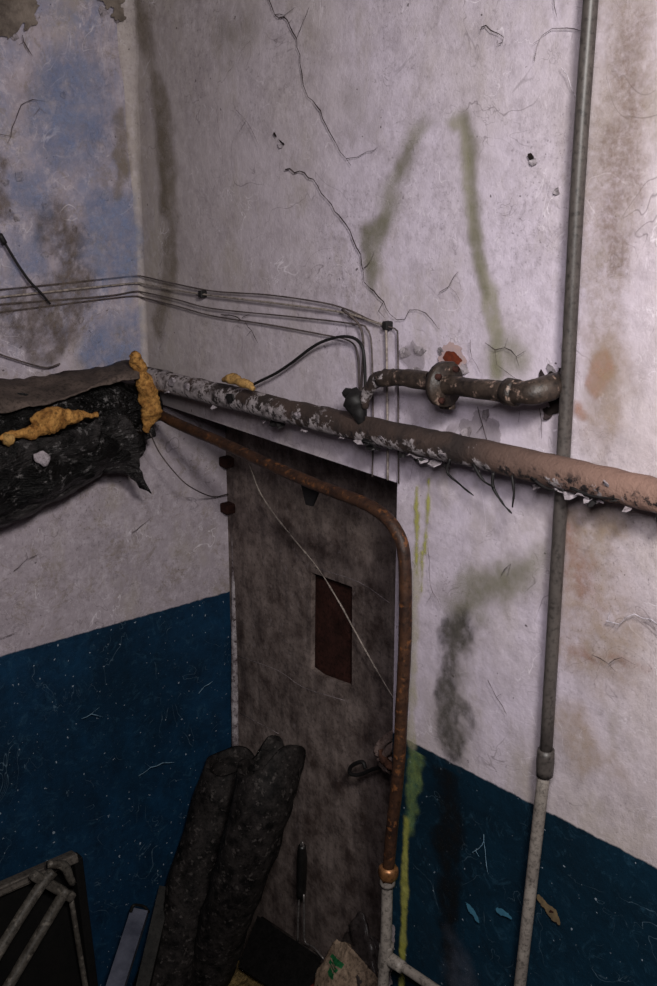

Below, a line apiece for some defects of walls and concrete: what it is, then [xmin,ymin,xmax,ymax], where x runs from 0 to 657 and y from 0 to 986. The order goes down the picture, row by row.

peeling [0,0,40,41]
peeling [98,0,126,23]
crack [534,6,580,60]
crack [269,0,375,164]
crack [285,168,438,328]